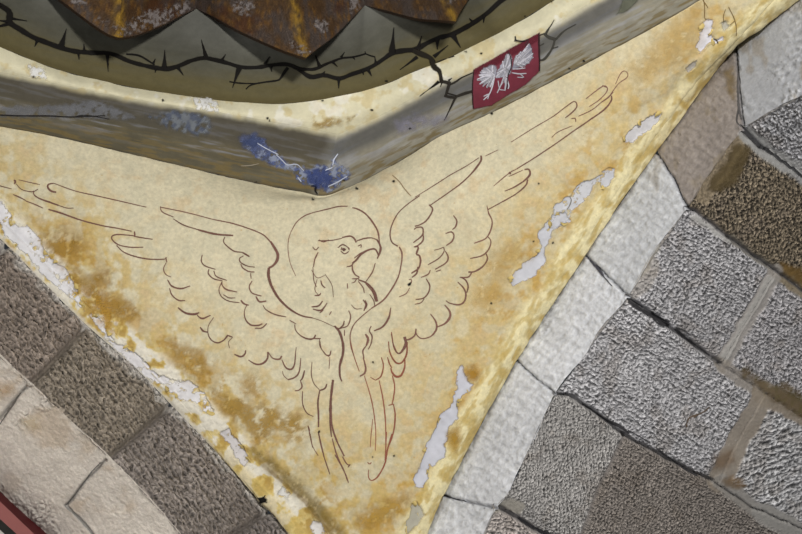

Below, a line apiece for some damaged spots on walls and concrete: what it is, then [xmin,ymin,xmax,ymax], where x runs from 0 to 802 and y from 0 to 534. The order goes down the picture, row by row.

flaking render [696,19,729,51]
flaking render [623,111,661,143]
damp [710,145,750,191]
flaking render [508,168,615,286]
flaking render [0,202,215,416]
flaking render [220,428,251,466]
flaking render [413,365,473,488]